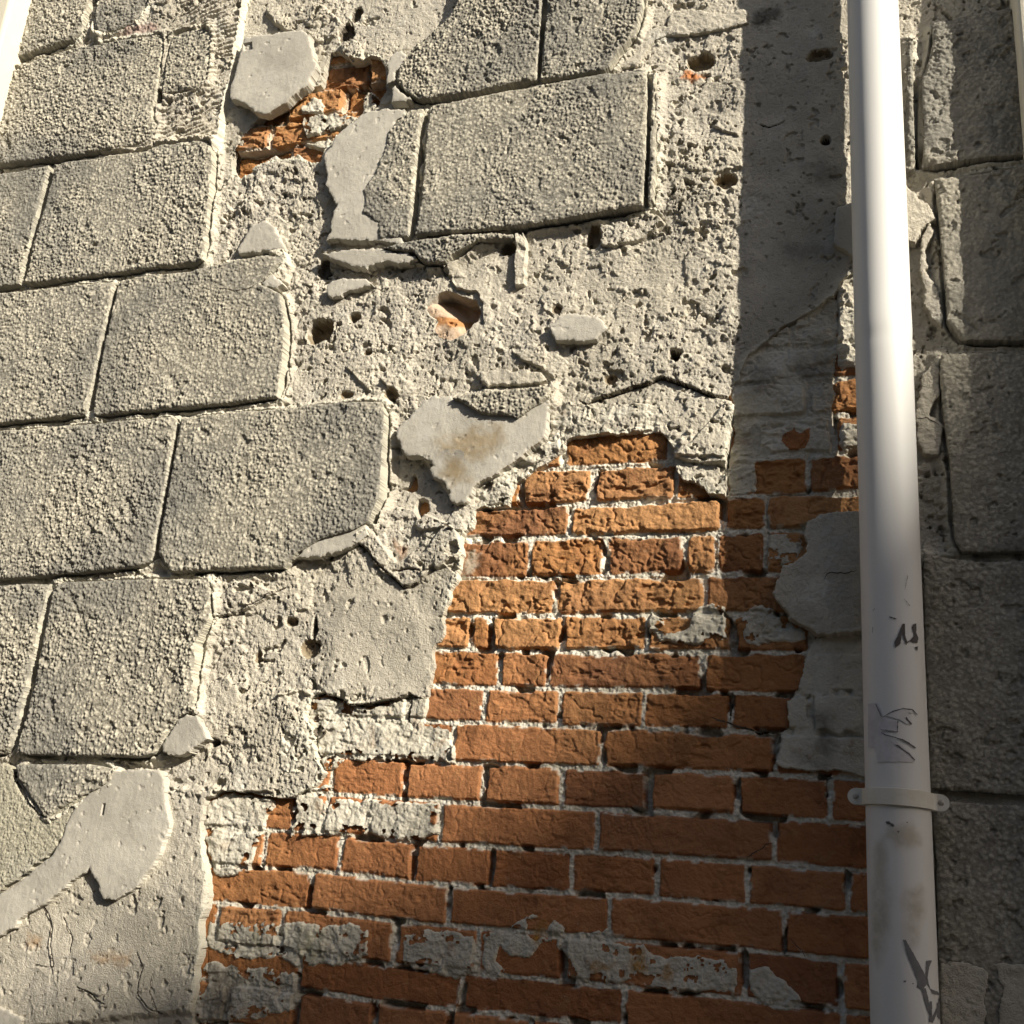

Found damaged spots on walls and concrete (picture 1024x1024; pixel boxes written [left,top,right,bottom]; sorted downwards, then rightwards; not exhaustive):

spalling [515,0,589,90]
spalling [230,30,437,246]
crack [580,376,731,413]
spalling [898,0,1024,717]
spalling [157,429,179,552]
peeling [396,395,552,506]
peeling [209,723,231,738]
peeling [203,684,242,723]
peeling [278,724,312,773]
peeling [194,961,305,1023]
peeling [207,921,369,967]
peeling [482,914,737,994]